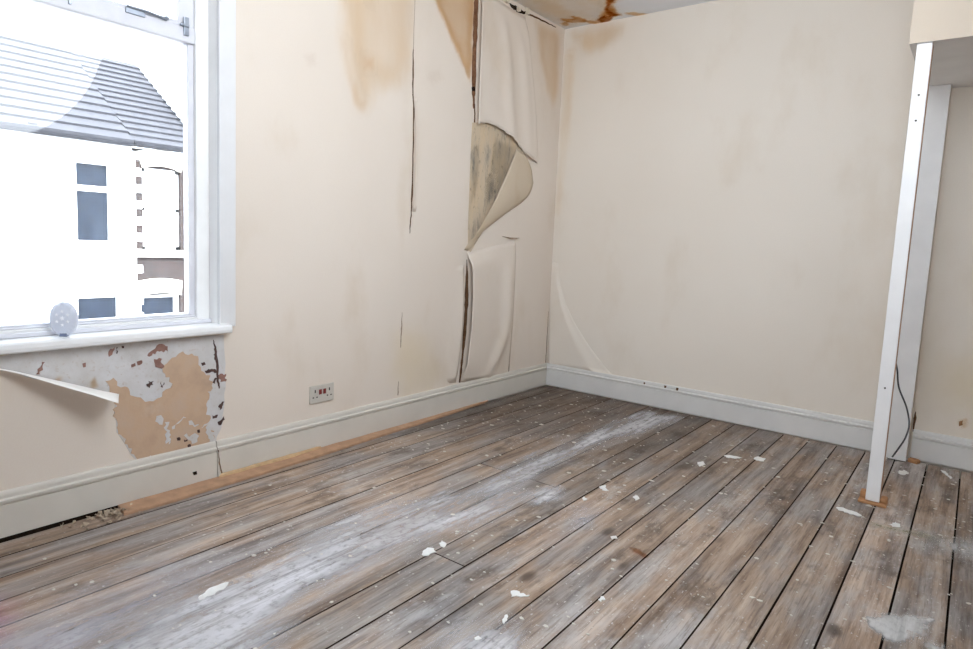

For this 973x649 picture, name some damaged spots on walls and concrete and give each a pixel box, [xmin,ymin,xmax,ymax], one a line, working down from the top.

flaking render [503,0,556,28]
flaking render [464,122,533,252]
peeling [0,335,227,460]